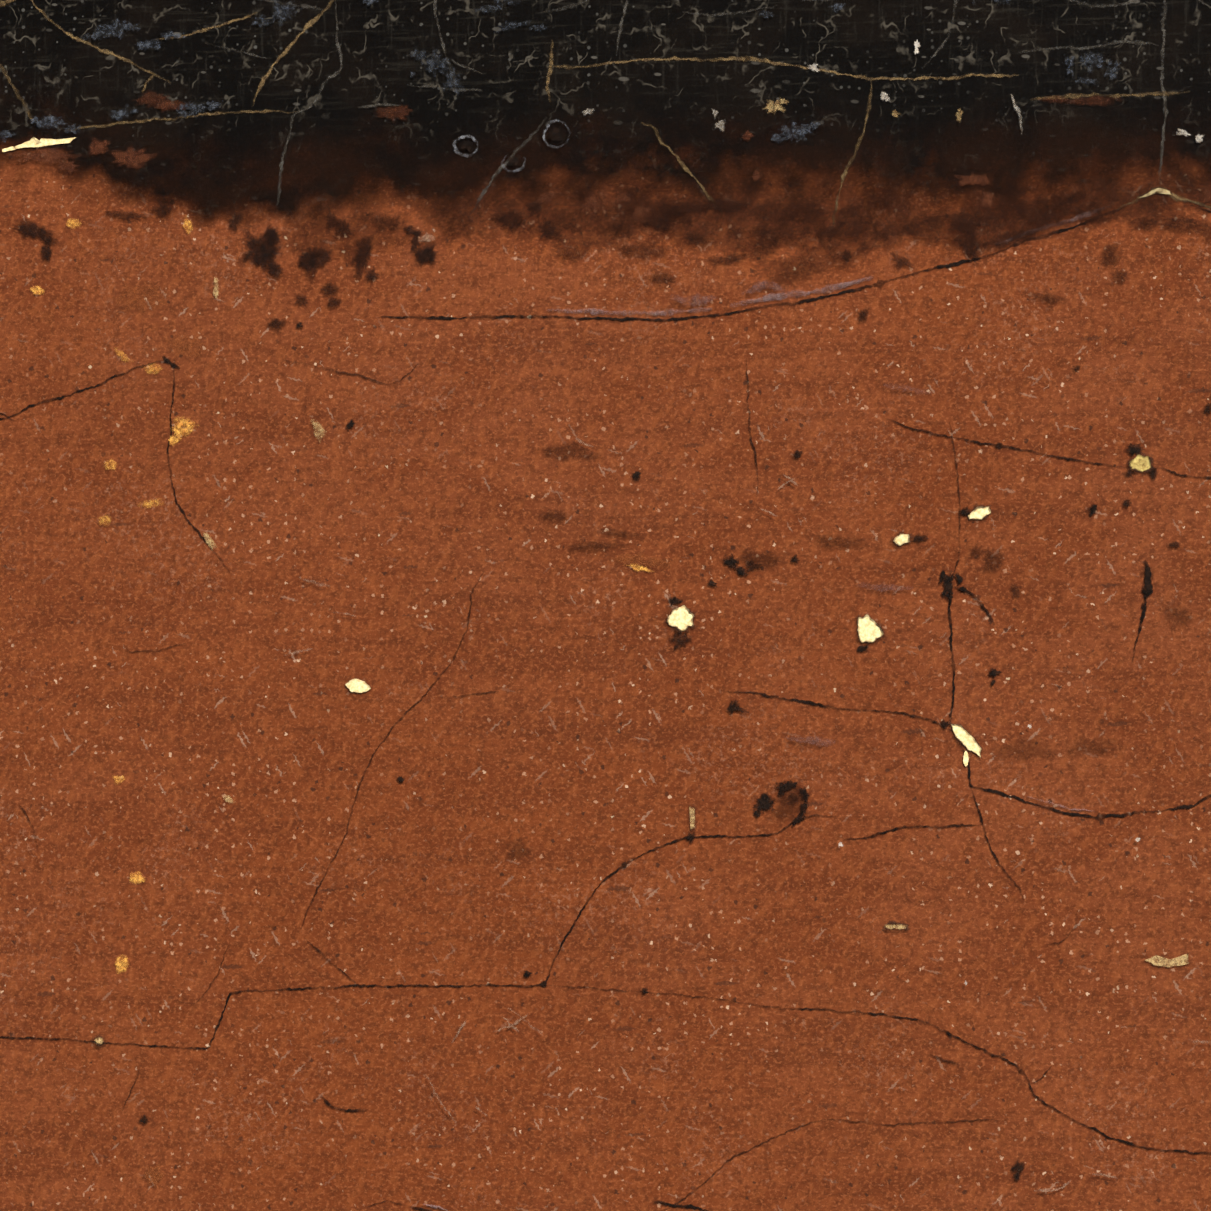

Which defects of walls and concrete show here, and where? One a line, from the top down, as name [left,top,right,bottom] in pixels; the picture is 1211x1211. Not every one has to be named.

crack [593,0,1013,80]
water stain [15,221,56,260]
water stain [230,215,283,278]
water stain [299,248,331,276]
water stain [404,226,436,264]
crack [382,279,870,322]
peeling [666,596,696,649]
peeling [857,615,884,652]
peeling [345,679,371,693]
peeling [941,720,981,766]
crack [850,761,1208,889]
crack [0,815,812,1050]